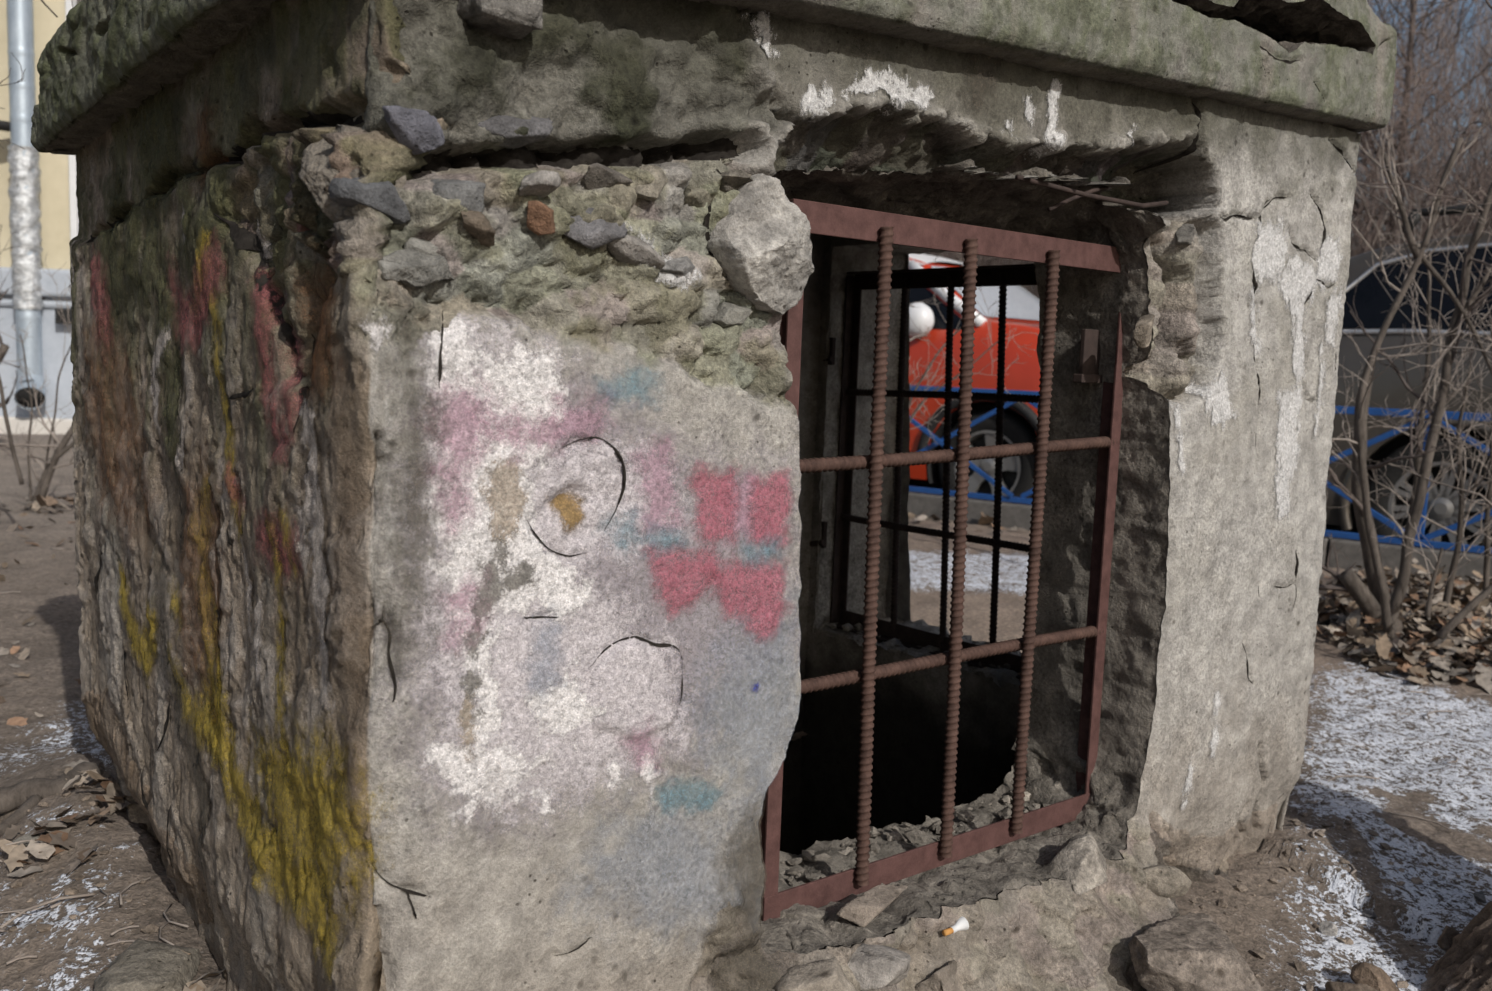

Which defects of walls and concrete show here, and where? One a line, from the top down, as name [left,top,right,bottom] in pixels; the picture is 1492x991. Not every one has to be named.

crack [1172,0,1386,102]
crack [409,138,739,280]
crack [1220,195,1337,403]
spalling [225,0,1220,823]
crack [527,436,626,557]
crack [372,606,397,702]
crack [590,636,683,705]